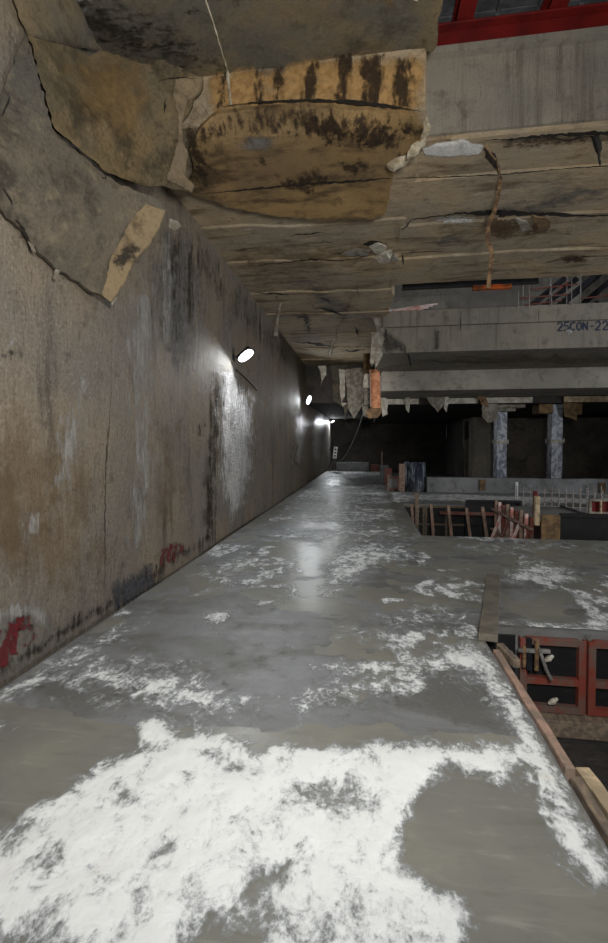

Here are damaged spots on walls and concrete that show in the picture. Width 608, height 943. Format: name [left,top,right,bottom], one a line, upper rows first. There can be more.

leakage [77,0,196,67]
leakage [184,54,424,190]
crack [485,130,608,141]
leakage [276,171,327,194]
crack [204,165,608,194]
crack [402,210,608,230]
leakage [124,233,206,549]
peeling [318,317,388,419]
leakage [0,365,264,675]